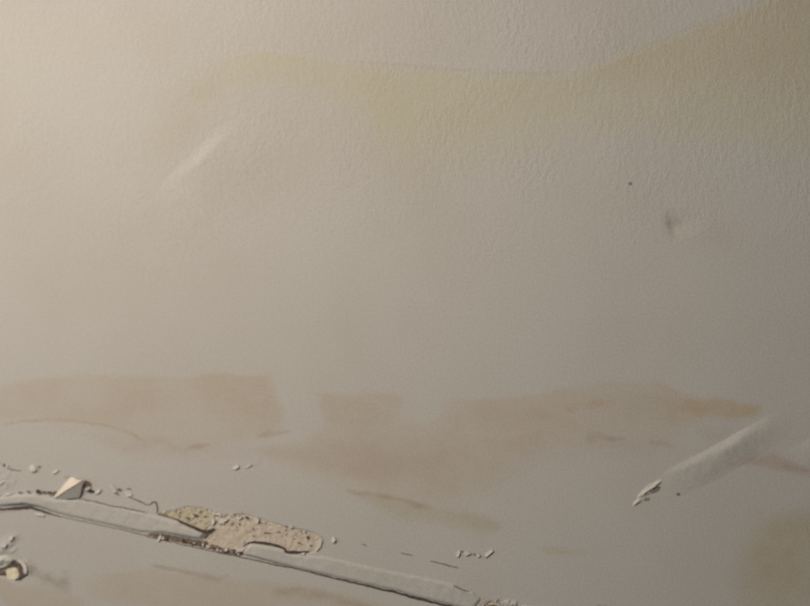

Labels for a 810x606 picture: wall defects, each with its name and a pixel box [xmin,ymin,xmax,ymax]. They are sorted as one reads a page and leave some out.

peeling [18,470,101,499]
flaking render [148,507,336,556]